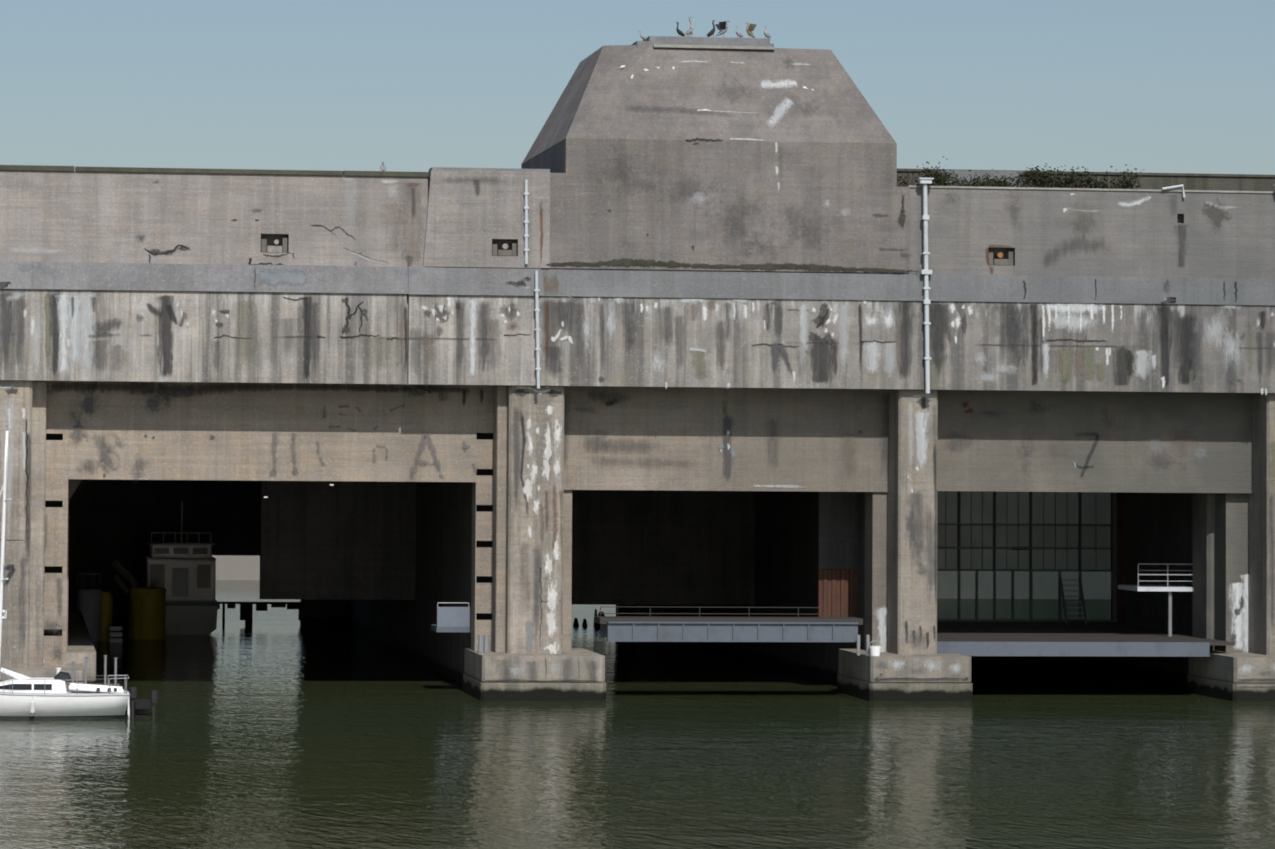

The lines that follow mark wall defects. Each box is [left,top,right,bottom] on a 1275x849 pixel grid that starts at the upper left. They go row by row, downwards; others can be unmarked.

water stain [1,293,35,357]
water stain [51,294,487,440]
water stain [551,296,620,372]
water stain [680,298,836,382]
water stain [859,300,880,372]
water stain [900,302,909,375]
water stain [1003,303,1198,386]
water stain [1212,311,1265,371]
peeling [515,386,562,539]
peeling [542,535,560,654]
peeling [1229,574,1249,652]